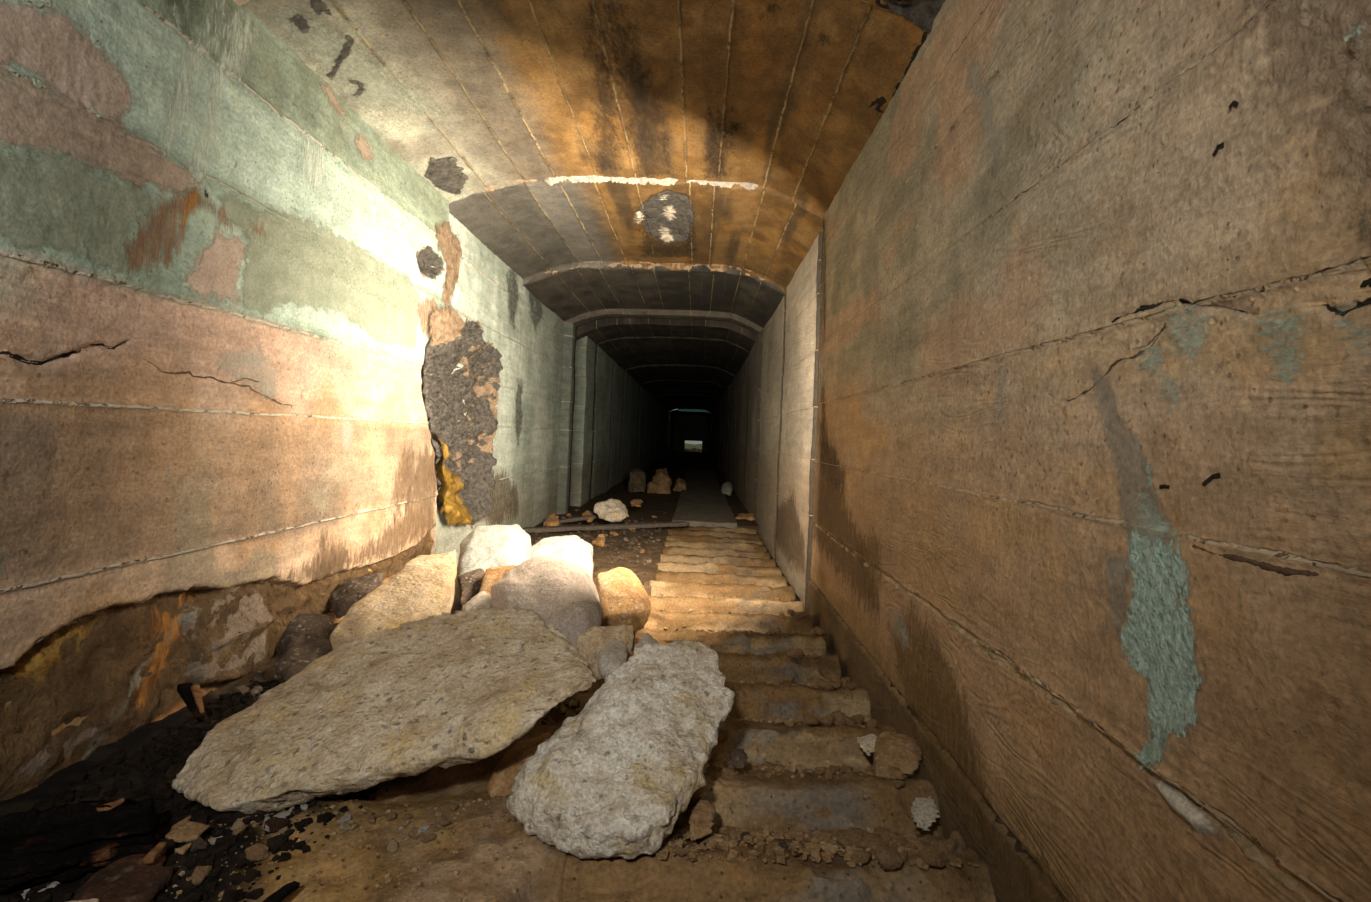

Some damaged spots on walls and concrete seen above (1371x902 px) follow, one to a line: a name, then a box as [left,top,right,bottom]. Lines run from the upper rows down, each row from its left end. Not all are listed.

peeling [0,0,201,196]
crack [869,32,927,113]
corrosion [127,189,233,271]
spalling [416,245,445,279]
peeling [425,157,468,194]
spalling [636,190,694,242]
crack [1324,278,1371,315]
crack [0,341,292,408]
crack [1067,298,1256,401]
spalling [0,304,503,801]
corrosion [17,625,90,680]
corrosion [133,589,190,708]